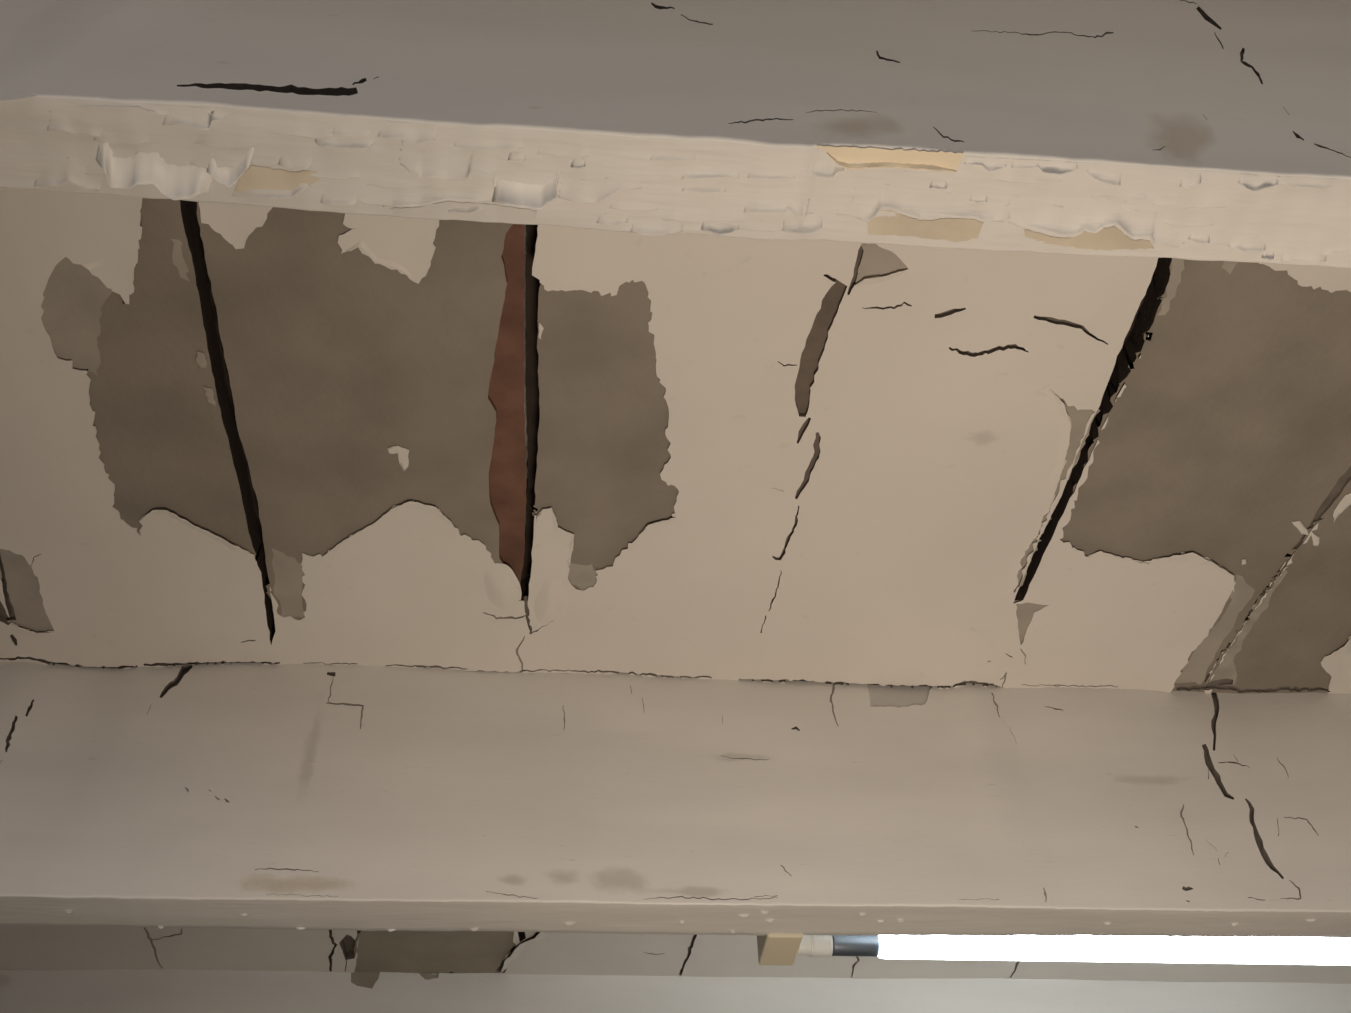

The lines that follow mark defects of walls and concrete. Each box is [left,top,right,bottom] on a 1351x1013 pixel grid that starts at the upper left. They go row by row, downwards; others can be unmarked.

peeling [34,100,1351,694]
crack [760,243,1108,633]
crack [0,700,34,763]
peeling [0,549,55,638]
crack [0,554,484,729]
crack [483,596,712,713]
crack [752,679,849,726]
crack [888,649,1118,744]
crack [1176,466,1351,900]
peeling [351,928,549,989]